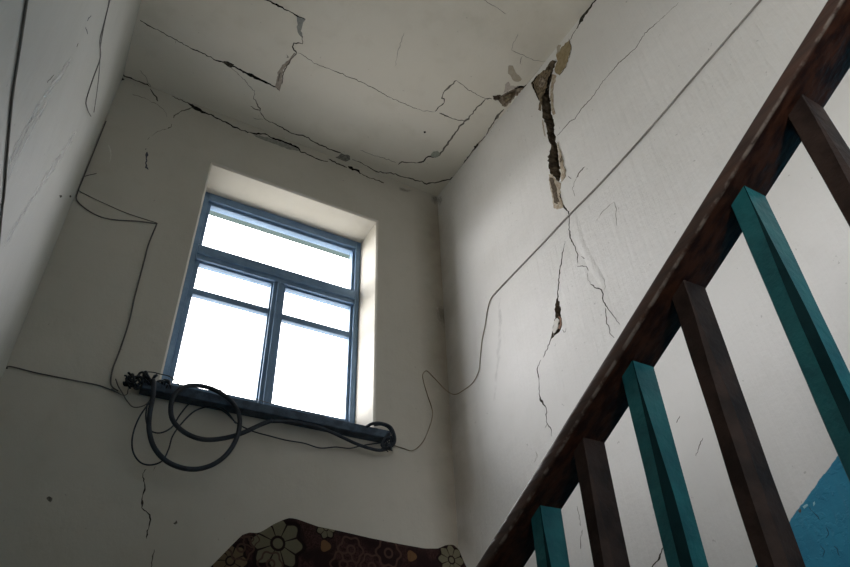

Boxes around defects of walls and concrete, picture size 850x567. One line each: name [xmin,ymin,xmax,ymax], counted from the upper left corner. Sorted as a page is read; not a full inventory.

crack [266,0,306,20]
flaking render [275,17,305,91]
crack [121,20,504,185]
spalling [493,65,526,107]
crack [512,0,678,336]
spalling [543,248,566,357]
crack [537,360,552,436]